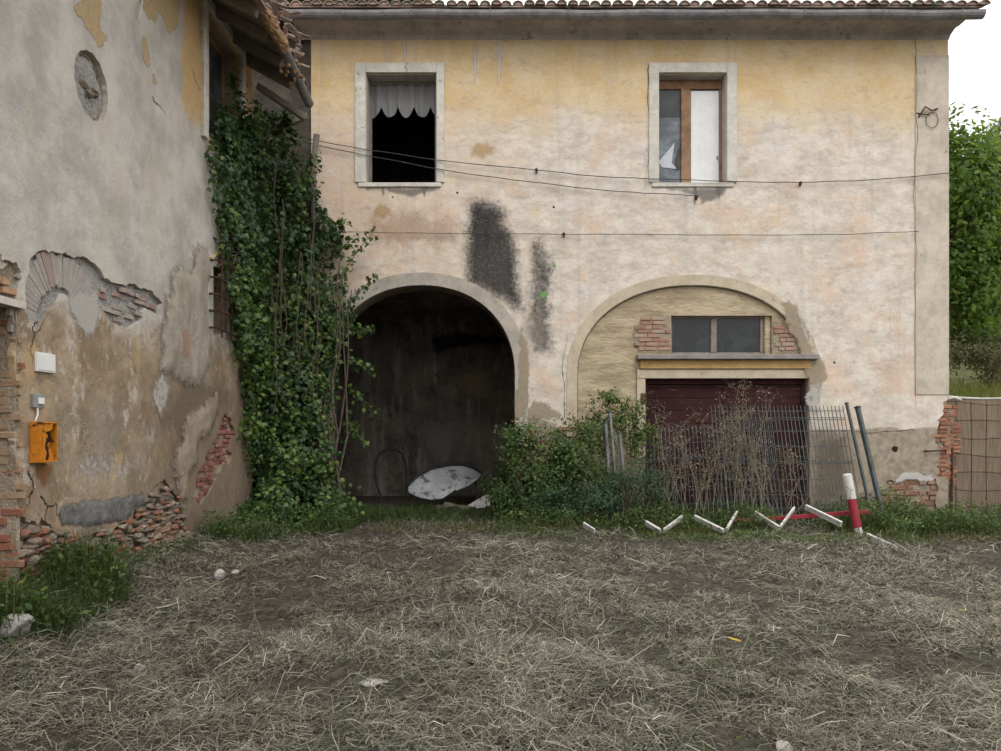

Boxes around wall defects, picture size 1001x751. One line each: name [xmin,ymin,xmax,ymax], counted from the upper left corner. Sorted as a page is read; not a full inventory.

peeling [75,0,107,47]
peeling [140,0,180,34]
damp [466,199,524,310]
flaking render [0,251,158,593]
flaking render [192,416,234,504]
spalling [881,401,952,515]